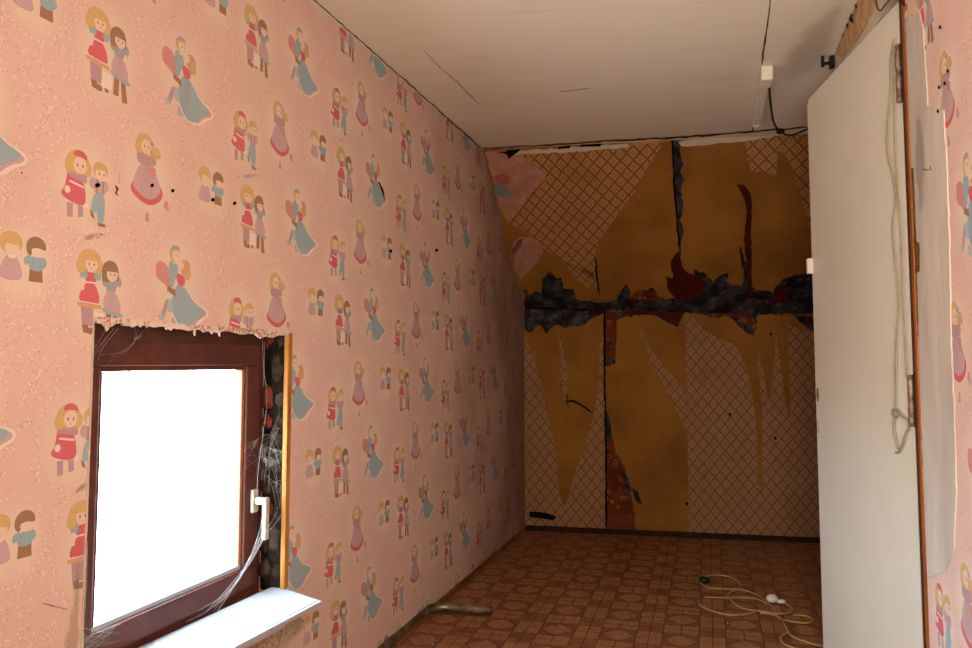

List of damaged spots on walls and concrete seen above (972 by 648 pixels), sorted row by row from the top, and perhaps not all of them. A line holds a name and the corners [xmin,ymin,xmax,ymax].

crack [314,0,808,255]
peeling [515,141,664,155]
peeling [678,135,781,147]
peeling [102,321,149,331]
peeling [189,326,221,337]
peeling [603,290,684,362]